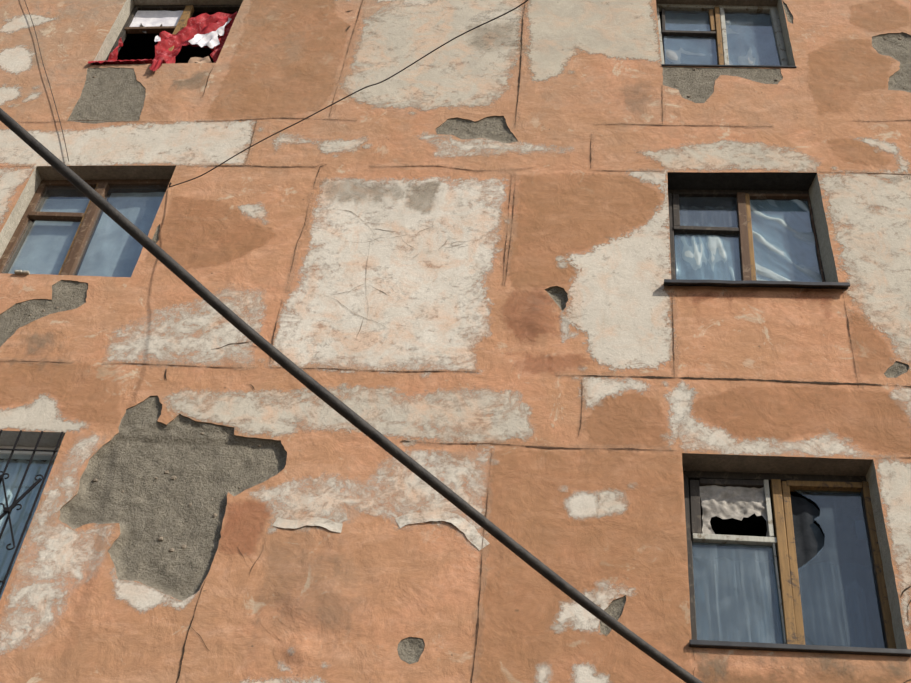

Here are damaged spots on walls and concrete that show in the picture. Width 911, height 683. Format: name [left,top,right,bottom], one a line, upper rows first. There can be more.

peeling [0,67,261,223]
crack [213,1,363,189]
peeling [341,0,783,157]
spalling [872,32,911,93]
crack [111,302,283,380]
peeling [0,177,534,653]
crack [305,366,442,374]
crack [288,209,468,338]
crack [400,291,911,683]
peeling [545,138,911,407]
crack [176,582,208,683]
peeling [552,582,636,636]